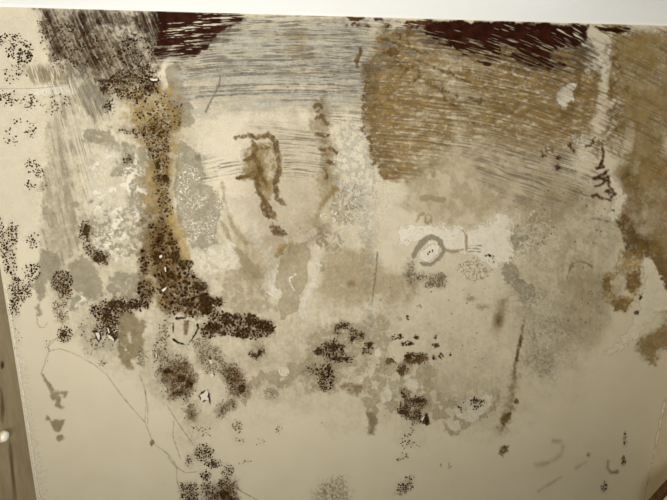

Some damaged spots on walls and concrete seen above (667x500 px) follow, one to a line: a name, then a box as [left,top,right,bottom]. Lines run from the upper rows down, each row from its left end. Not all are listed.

damp [0,33,70,115]
rust [234,132,287,236]
damp [362,25,667,299]
rust [591,147,616,201]
damp [0,218,41,321]
damp [37,19,276,436]
rust [603,214,649,312]
damp [306,322,373,392]
damp [386,333,452,376]
rust [637,325,667,366]
damp [396,388,428,461]
damp [179,443,251,500]